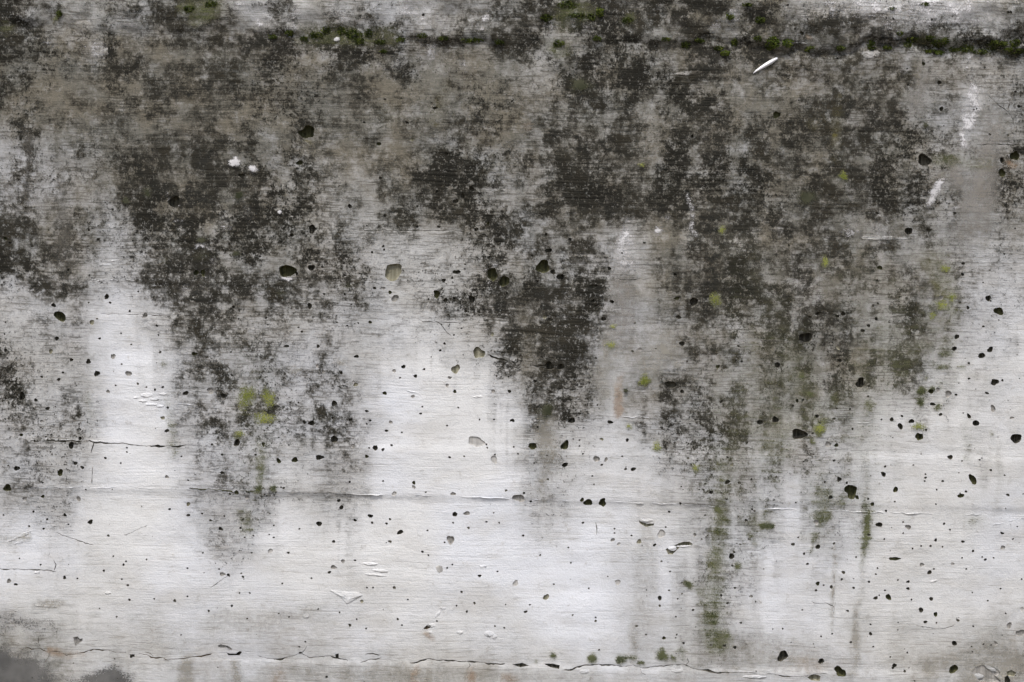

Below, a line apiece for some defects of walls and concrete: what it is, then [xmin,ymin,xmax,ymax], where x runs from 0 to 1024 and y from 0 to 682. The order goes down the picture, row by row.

damp [0,0,1024,540]
crack [31,440,185,452]
damp [683,560,742,613]
crack [26,637,211,663]
crack [259,646,380,663]
crack [411,658,505,668]
crack [564,658,825,677]